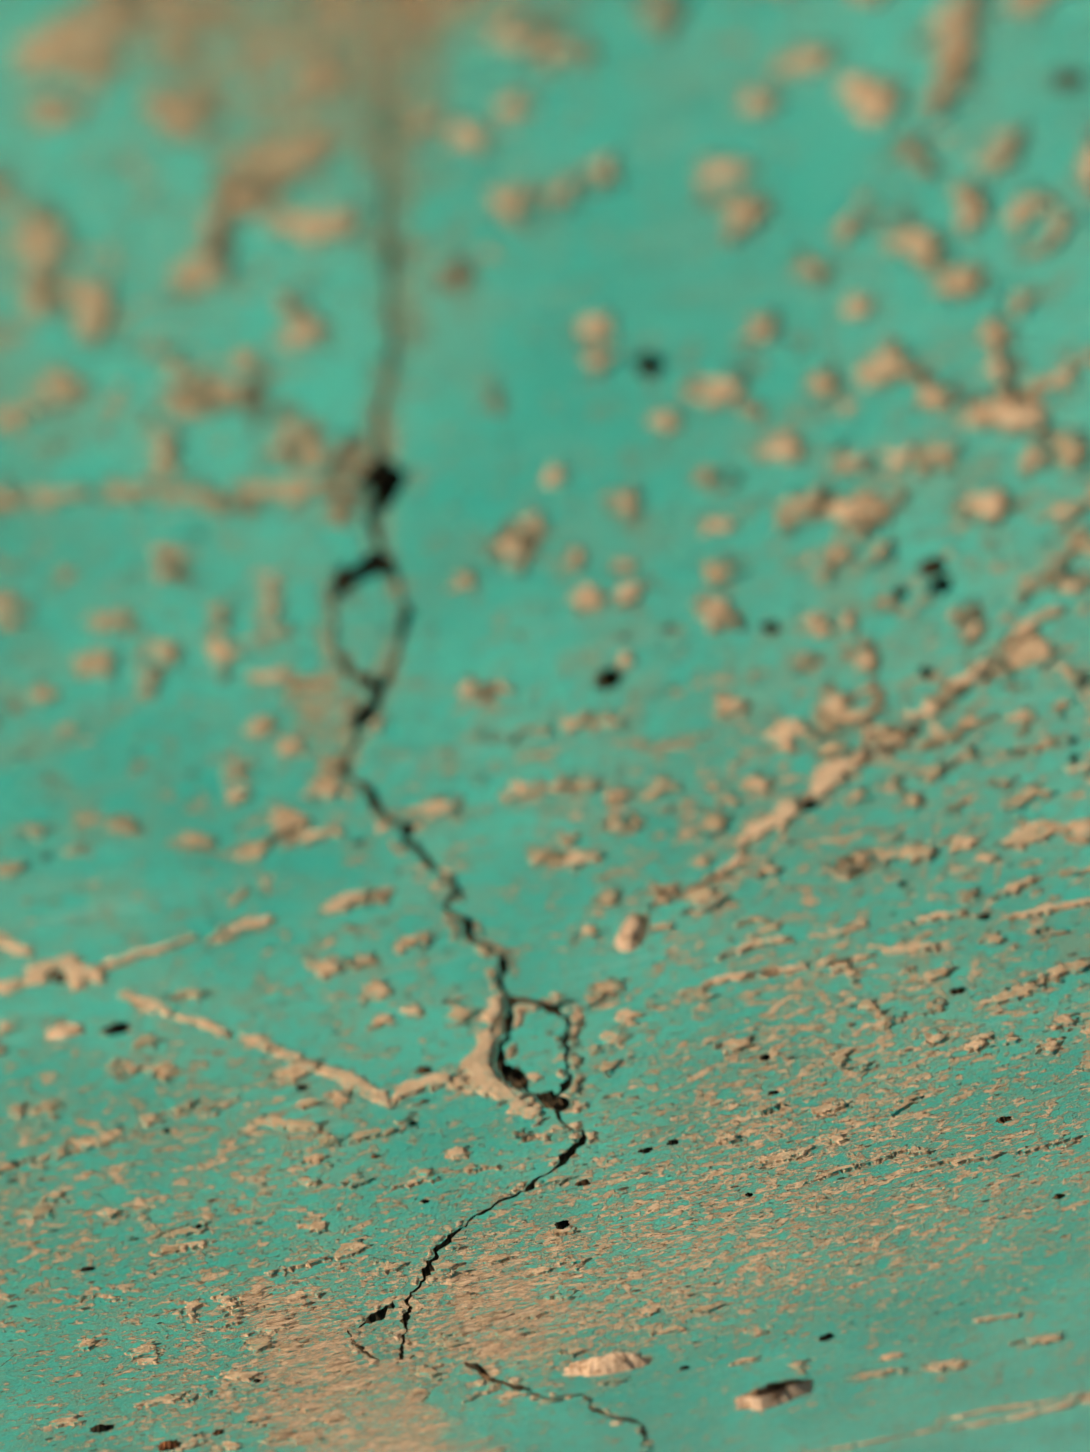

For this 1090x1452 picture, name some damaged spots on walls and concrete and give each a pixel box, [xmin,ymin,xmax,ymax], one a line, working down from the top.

peeling [11,0,367,302]
peeling [737,0,1090,586]
peeling [169,709,467,900]
crack [329,0,587,1363]
peeling [499,773,684,874]
peeling [579,593,1090,952]
peeling [251,914,652,1191]
peeling [856,957,1090,1056]
peeling [133,1220,592,1408]
crack [463,1362,654,1452]
peeling [557,1347,654,1387]
peeling [733,1359,815,1411]